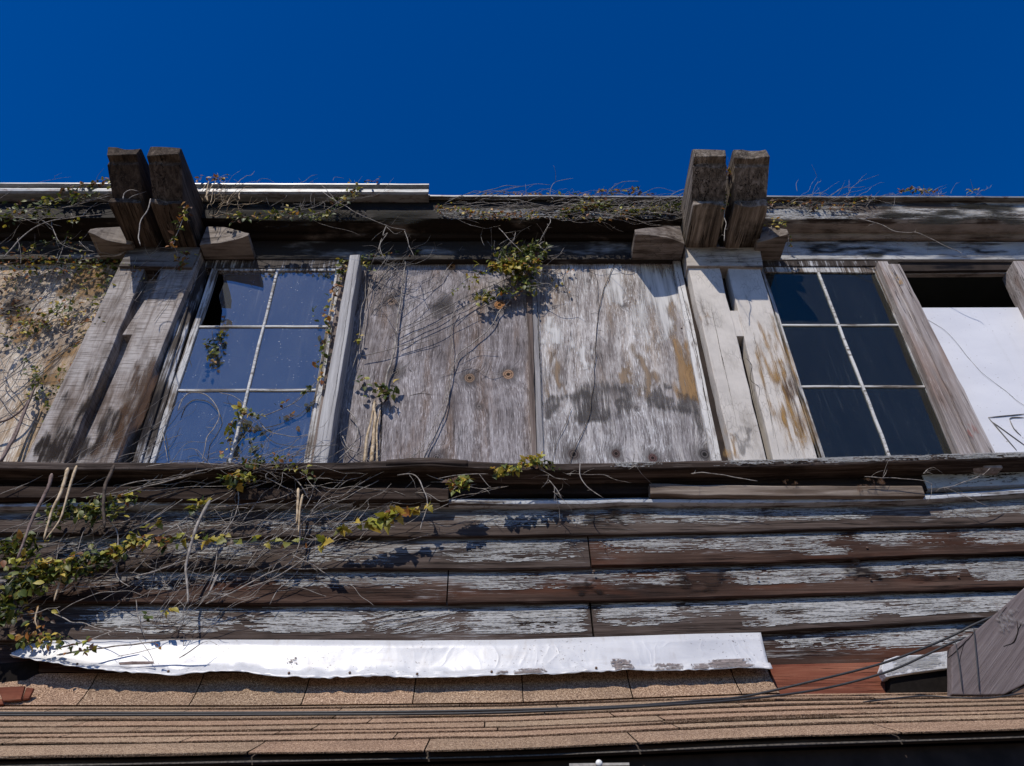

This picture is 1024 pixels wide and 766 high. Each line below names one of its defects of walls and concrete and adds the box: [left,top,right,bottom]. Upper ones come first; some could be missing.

water stain [541,316,701,431]
peeling [926,498,1024,544]
peeling [78,506,1024,675]